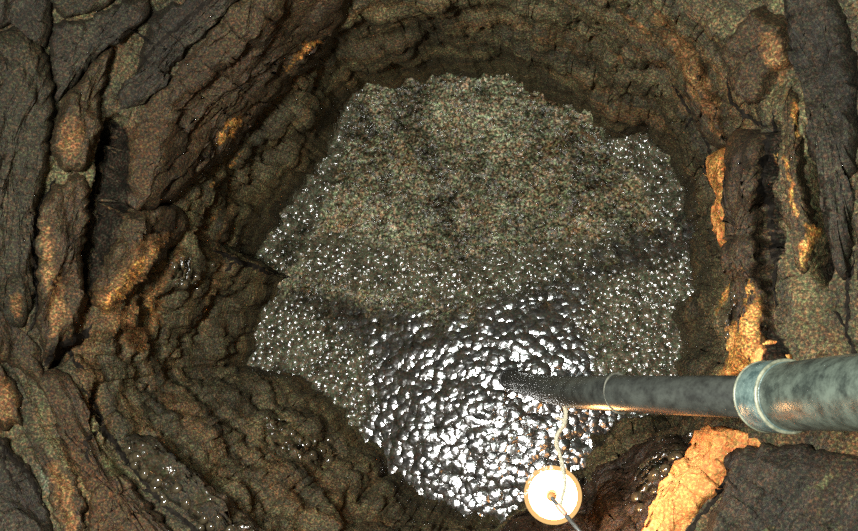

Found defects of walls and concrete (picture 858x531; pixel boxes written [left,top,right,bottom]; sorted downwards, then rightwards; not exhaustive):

rust [624,13,723,136]
rust [707,149,727,243]
leakage [100,442,255,531]